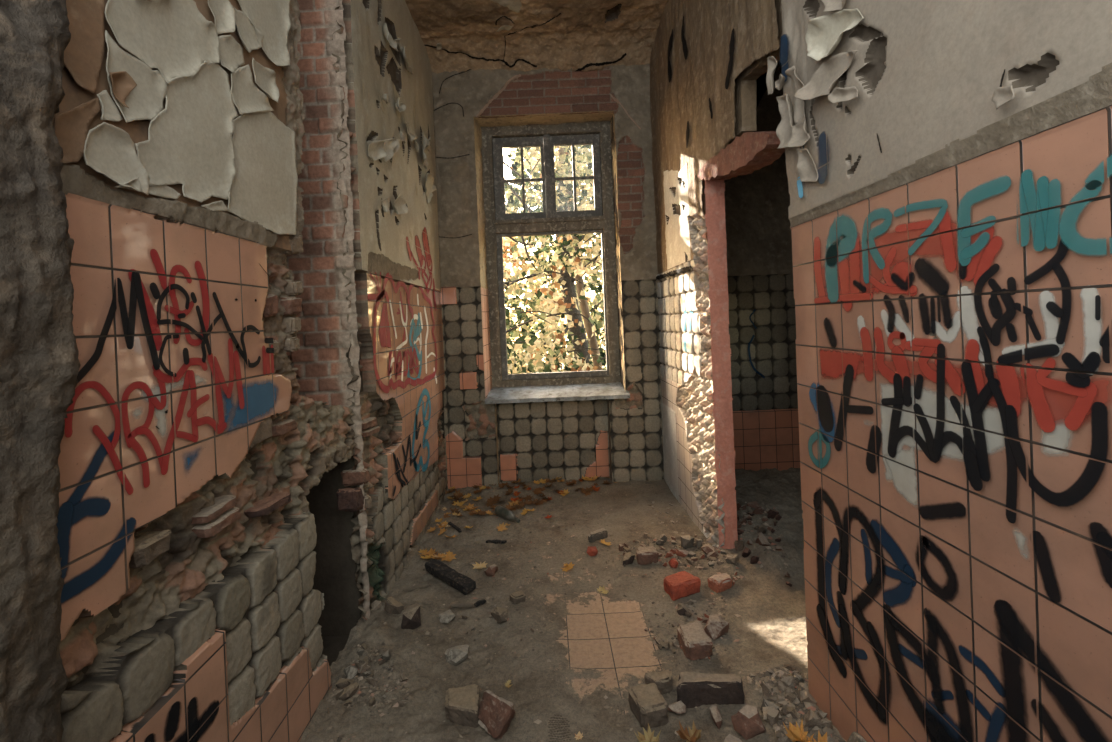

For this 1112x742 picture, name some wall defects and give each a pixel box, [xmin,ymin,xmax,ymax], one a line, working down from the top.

crack [425,13,561,117]
crack [576,53,627,71]
peeling [766,0,887,182]
peeling [992,52,1060,109]
peeling [54,0,725,742]